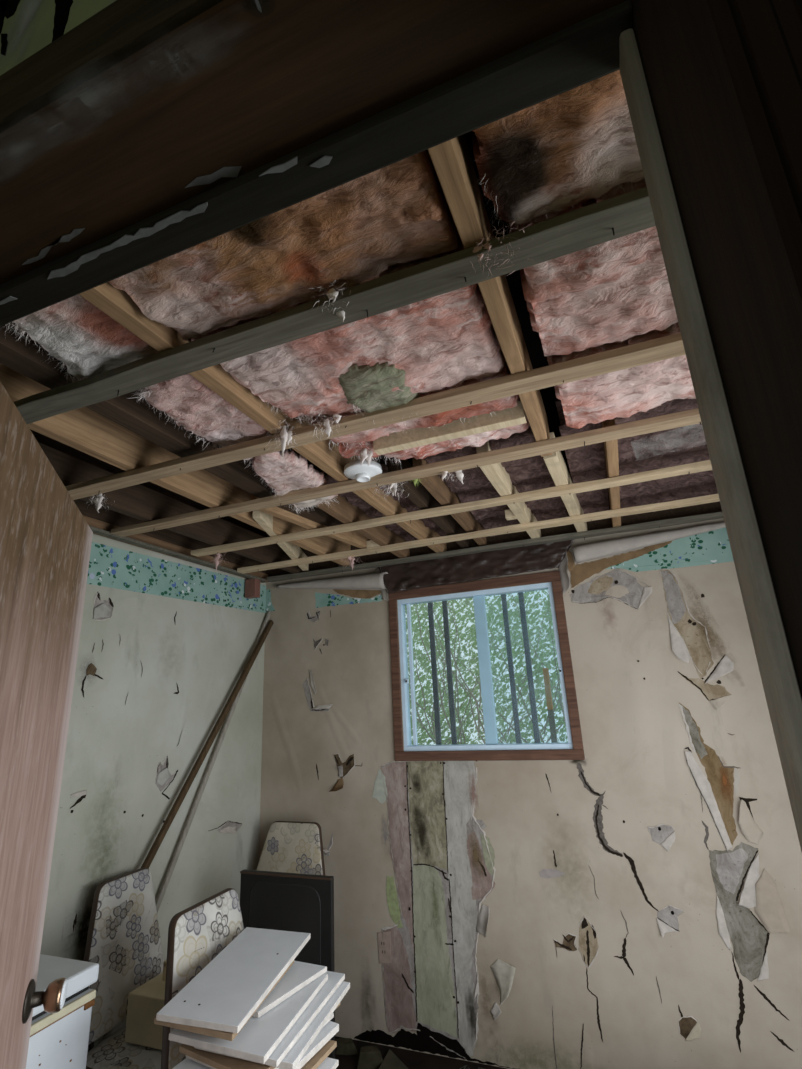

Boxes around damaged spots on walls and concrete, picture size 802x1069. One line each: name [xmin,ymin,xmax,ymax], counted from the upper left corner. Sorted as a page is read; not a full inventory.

peeling [185,166,241,188]
peeling [259,156,297,176]
peeling [310,155,333,168]
peeling [22,228,85,265]
peeling [47,202,208,279]
peeling [372,761,516,1058]
crack [577,763,662,1003]
crack [552,970,603,1069]
crack [735,979,794,1053]